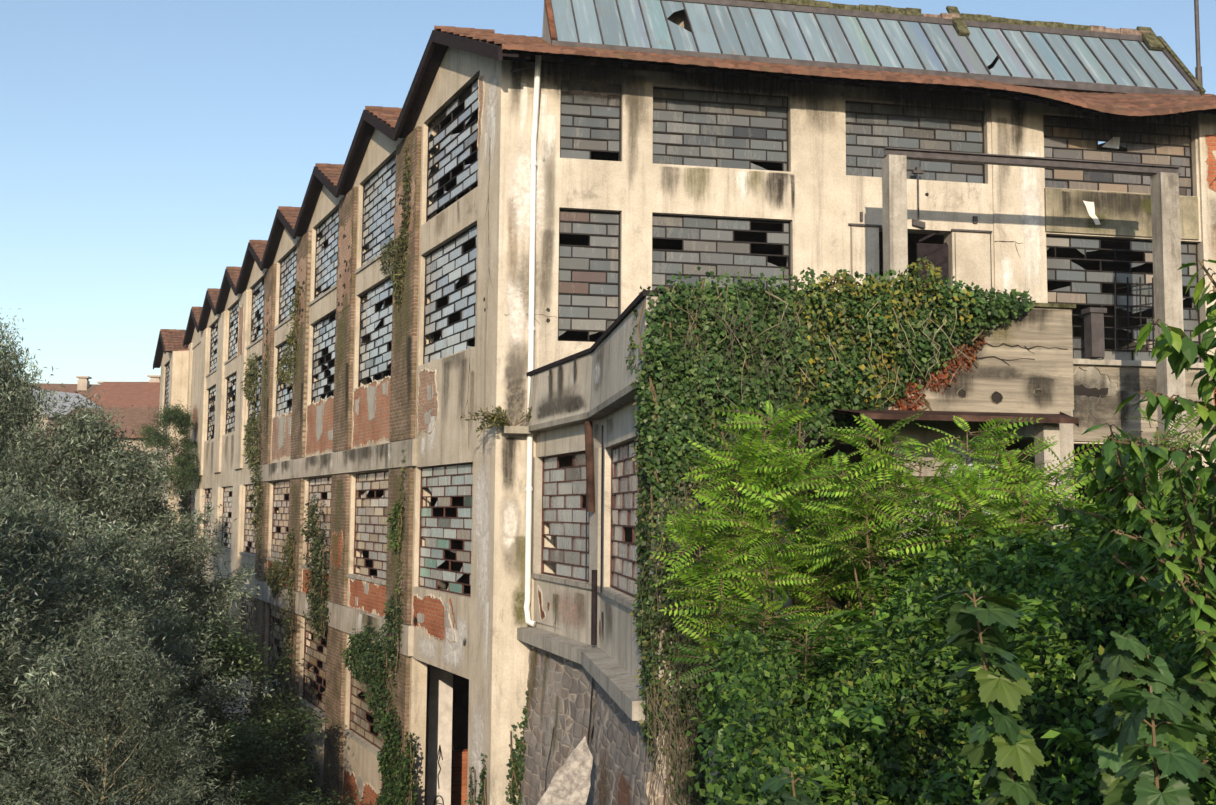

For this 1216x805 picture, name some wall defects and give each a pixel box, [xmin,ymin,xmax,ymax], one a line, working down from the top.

leakage [736,171,795,206]
spalling [1203,133,1216,192]
leakage [503,57,555,485]
crack [975,343,1068,366]
spalling [271,396,334,462]
spalling [352,375,391,449]
leakage [538,358,583,418]
spalling [302,530,386,617]
leakage [475,472,525,669]
spalling [411,593,466,646]
leakage [419,620,467,667]
spalling [342,768,381,805]